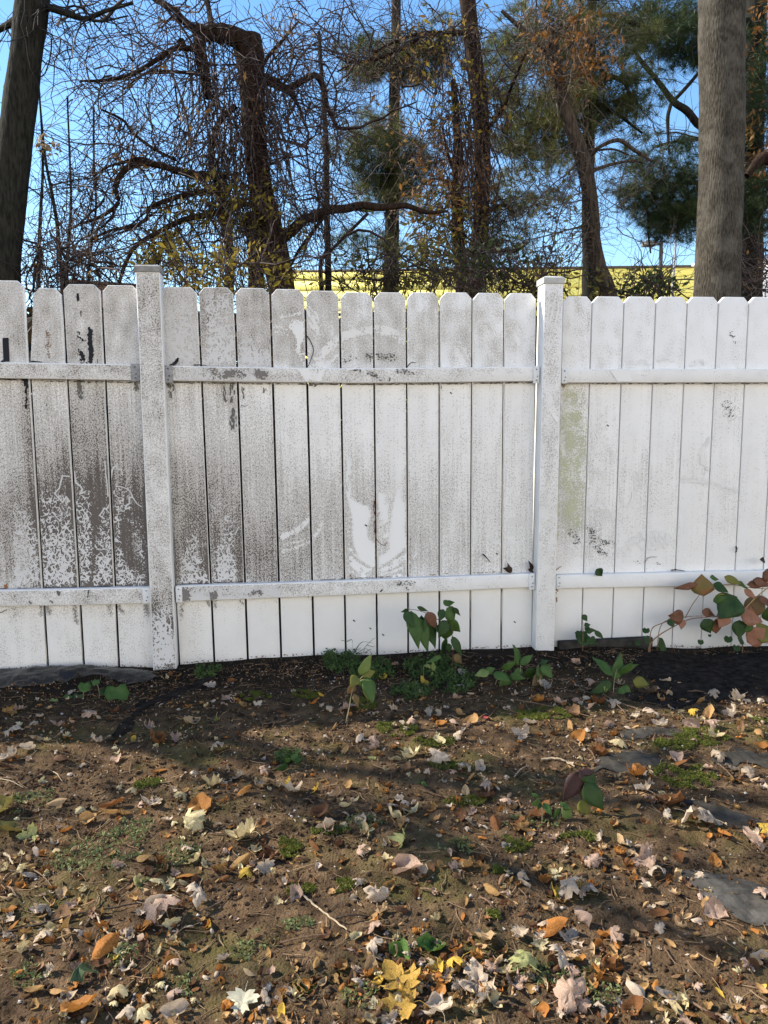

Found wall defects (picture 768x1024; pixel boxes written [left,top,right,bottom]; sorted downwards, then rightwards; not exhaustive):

water stain [0,272,768,670]